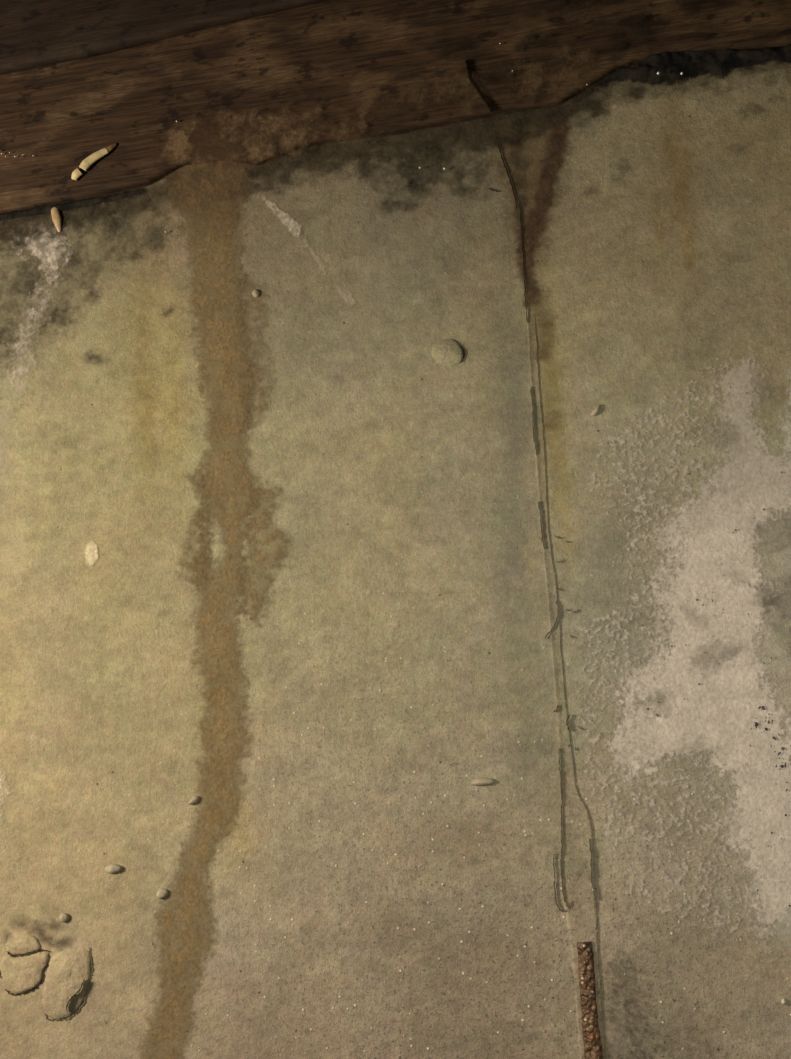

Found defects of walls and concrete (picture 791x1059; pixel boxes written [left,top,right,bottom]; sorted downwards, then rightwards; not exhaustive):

crack [489,139,527,317]
crack [529,388,537,452]
leakage [0,81,648,1059]
crack [538,503,579,639]
crack [553,705,584,912]
peeling [577,358,791,953]
mould [744,698,791,779]